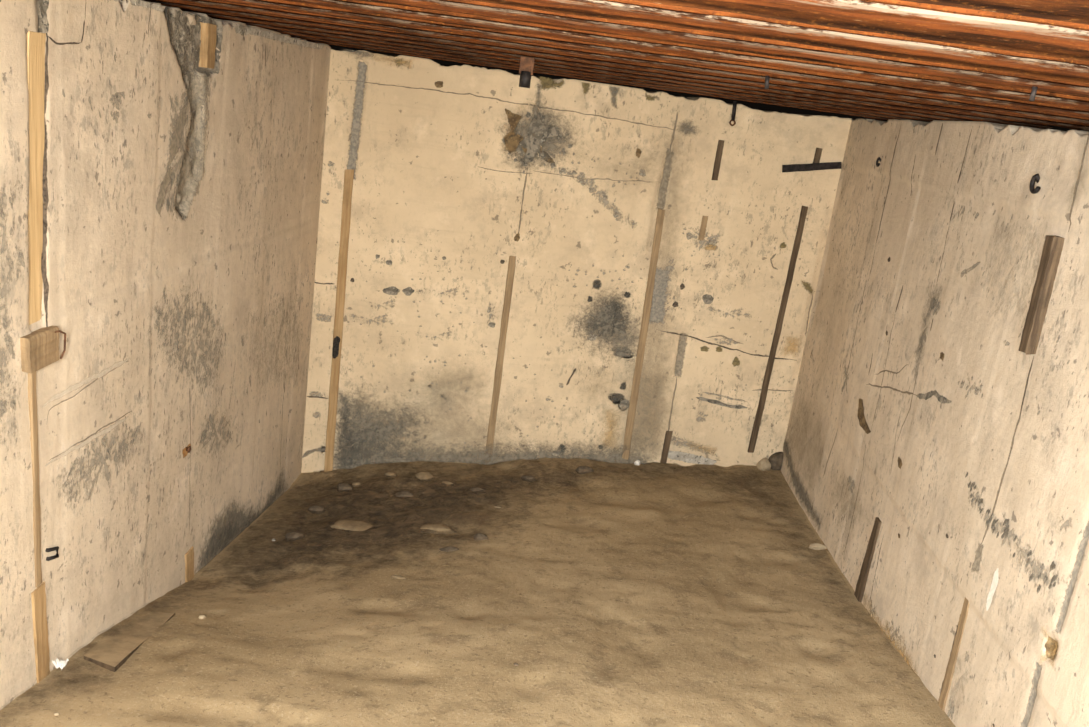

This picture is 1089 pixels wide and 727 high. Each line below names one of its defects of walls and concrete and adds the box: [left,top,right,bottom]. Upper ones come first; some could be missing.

peeling [89,62,125,124]
spalling [114,0,324,221]
mould [561,255,636,357]
leakage [302,390,649,469]